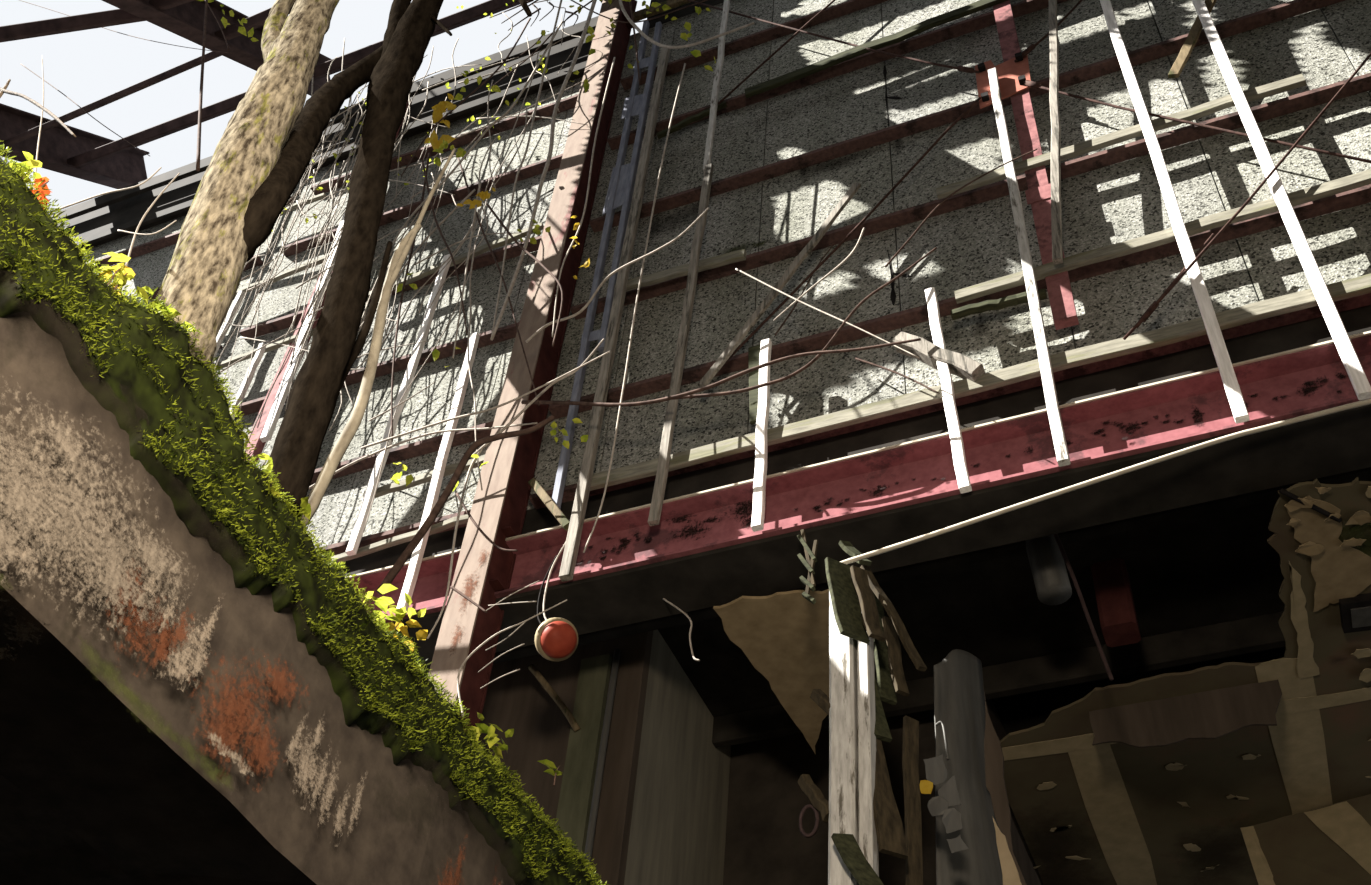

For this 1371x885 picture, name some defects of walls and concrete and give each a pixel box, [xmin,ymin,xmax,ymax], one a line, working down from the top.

flaking render [1284,486,1371,683]
leakage [286,720,367,834]